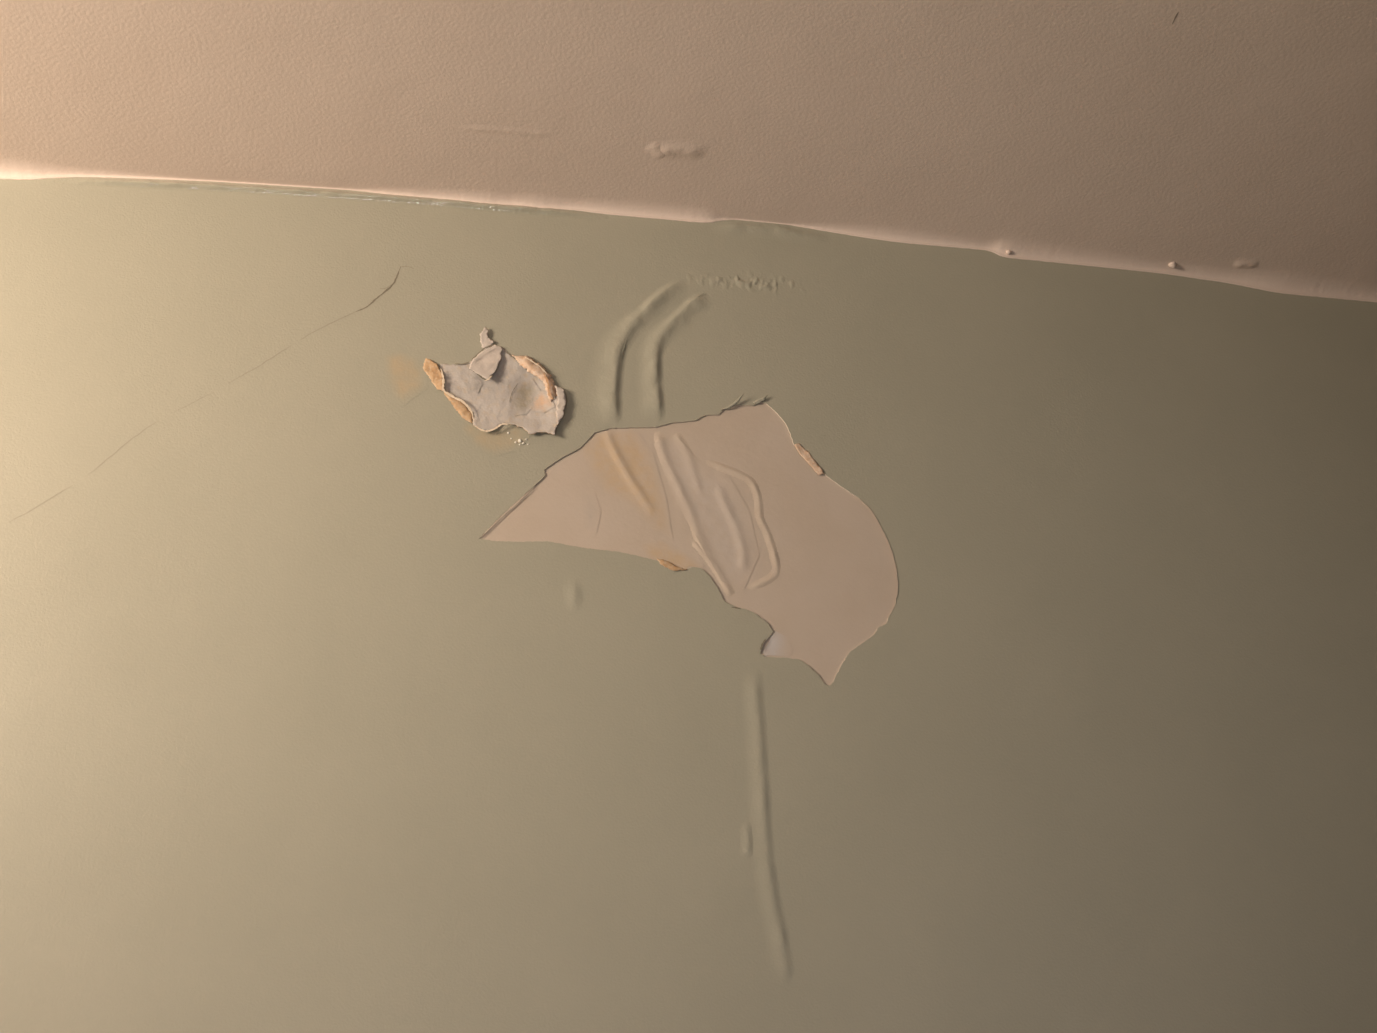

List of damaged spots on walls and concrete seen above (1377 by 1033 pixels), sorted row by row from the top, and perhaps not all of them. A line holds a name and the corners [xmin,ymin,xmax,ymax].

peeling [423,327,566,445]
peeling [480,394,898,686]